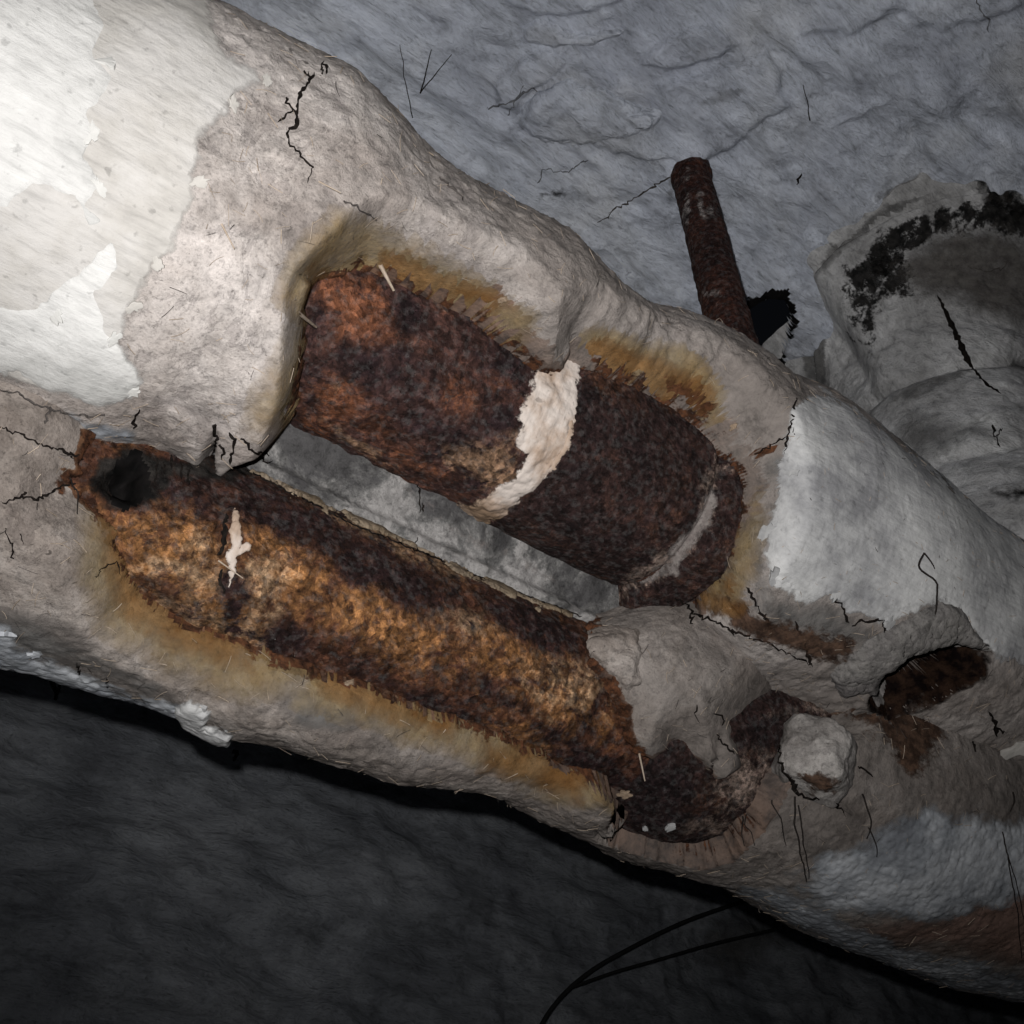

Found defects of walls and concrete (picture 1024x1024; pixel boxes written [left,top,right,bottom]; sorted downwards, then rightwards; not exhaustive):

crack [278,61,329,184]
peeling [0,0,273,406]
corrosion [287,222,521,332]
flaking render [309,257,561,376]
water stain [822,180,1024,345]
crack [937,295,1001,394]
crack [0,390,105,559]
crack [211,424,485,579]
flaking render [580,358,748,569]
corrosion [92,529,287,687]
corrosion [700,525,855,664]
corrosion [307,675,603,801]